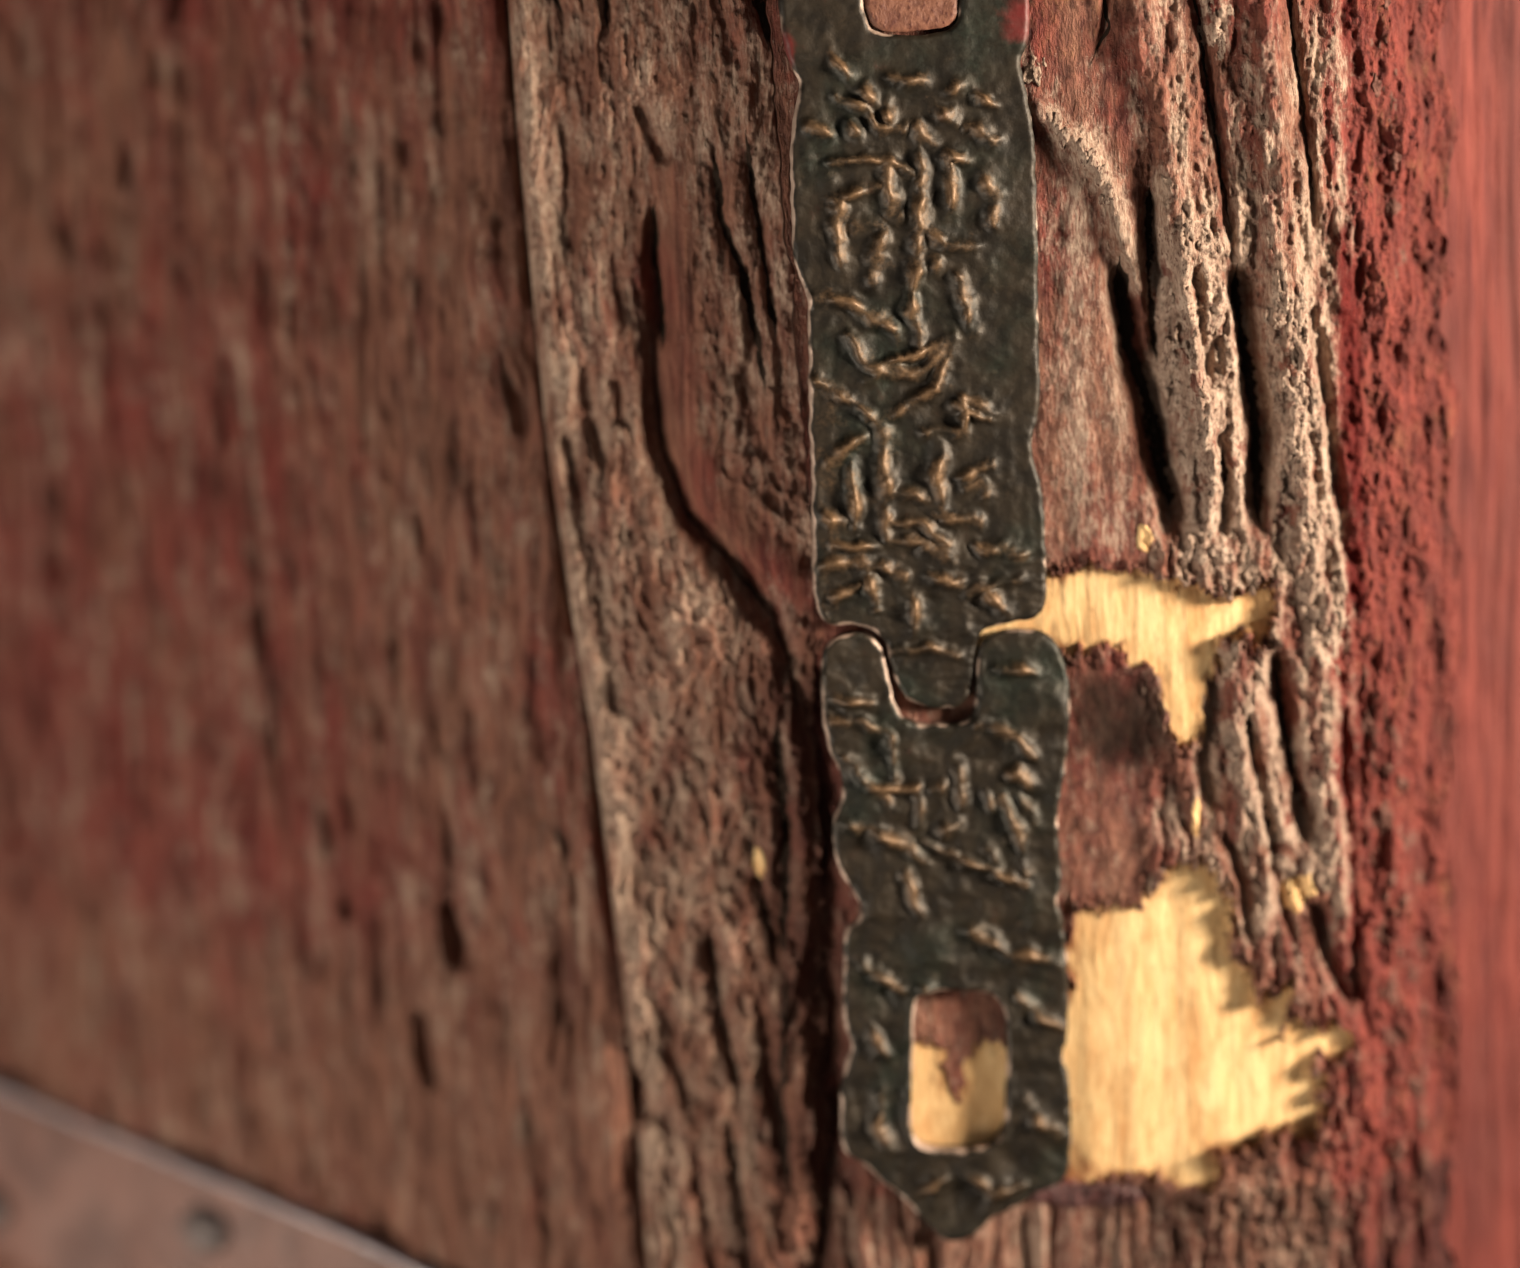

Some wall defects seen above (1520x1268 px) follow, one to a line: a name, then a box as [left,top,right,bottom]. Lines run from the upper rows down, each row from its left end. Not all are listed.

crack [1091,0,1111,63]
crack [1112,183,1176,515]
crack [1193,0,1264,533]
peeling [975,216,1350,915]
peeling [911,1030,1007,1146]
peeling [1062,798,1358,1202]
peeling [1359,636,1431,1244]